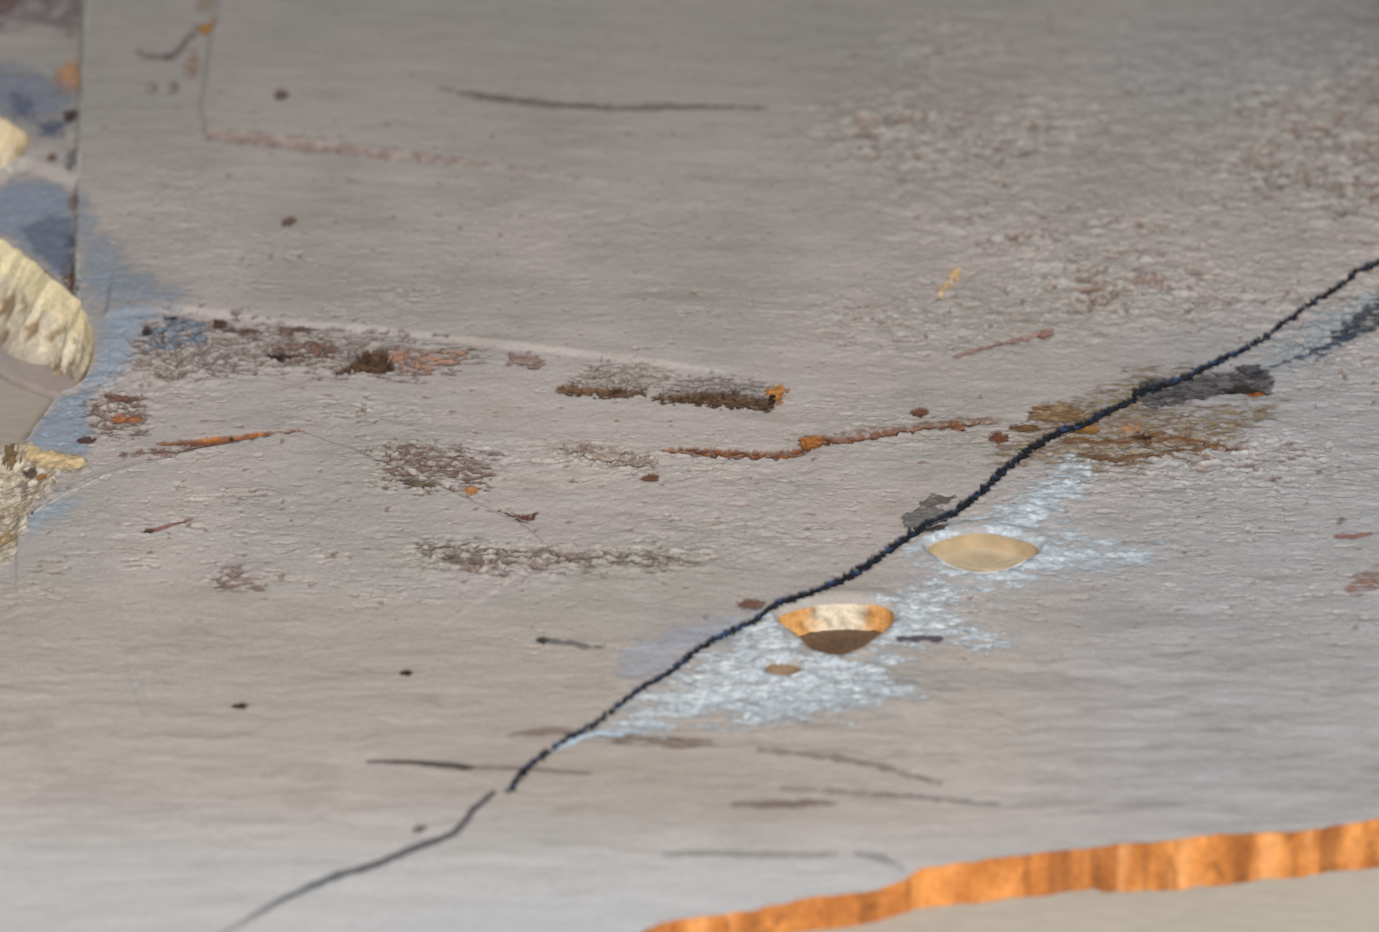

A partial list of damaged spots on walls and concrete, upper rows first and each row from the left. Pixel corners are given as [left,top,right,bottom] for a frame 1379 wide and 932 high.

corrosion [994,366,1289,474]
crack [287,259,1379,898]
leakage [517,453,1166,750]
leakage [775,750,895,771]
leakage [733,775,989,807]